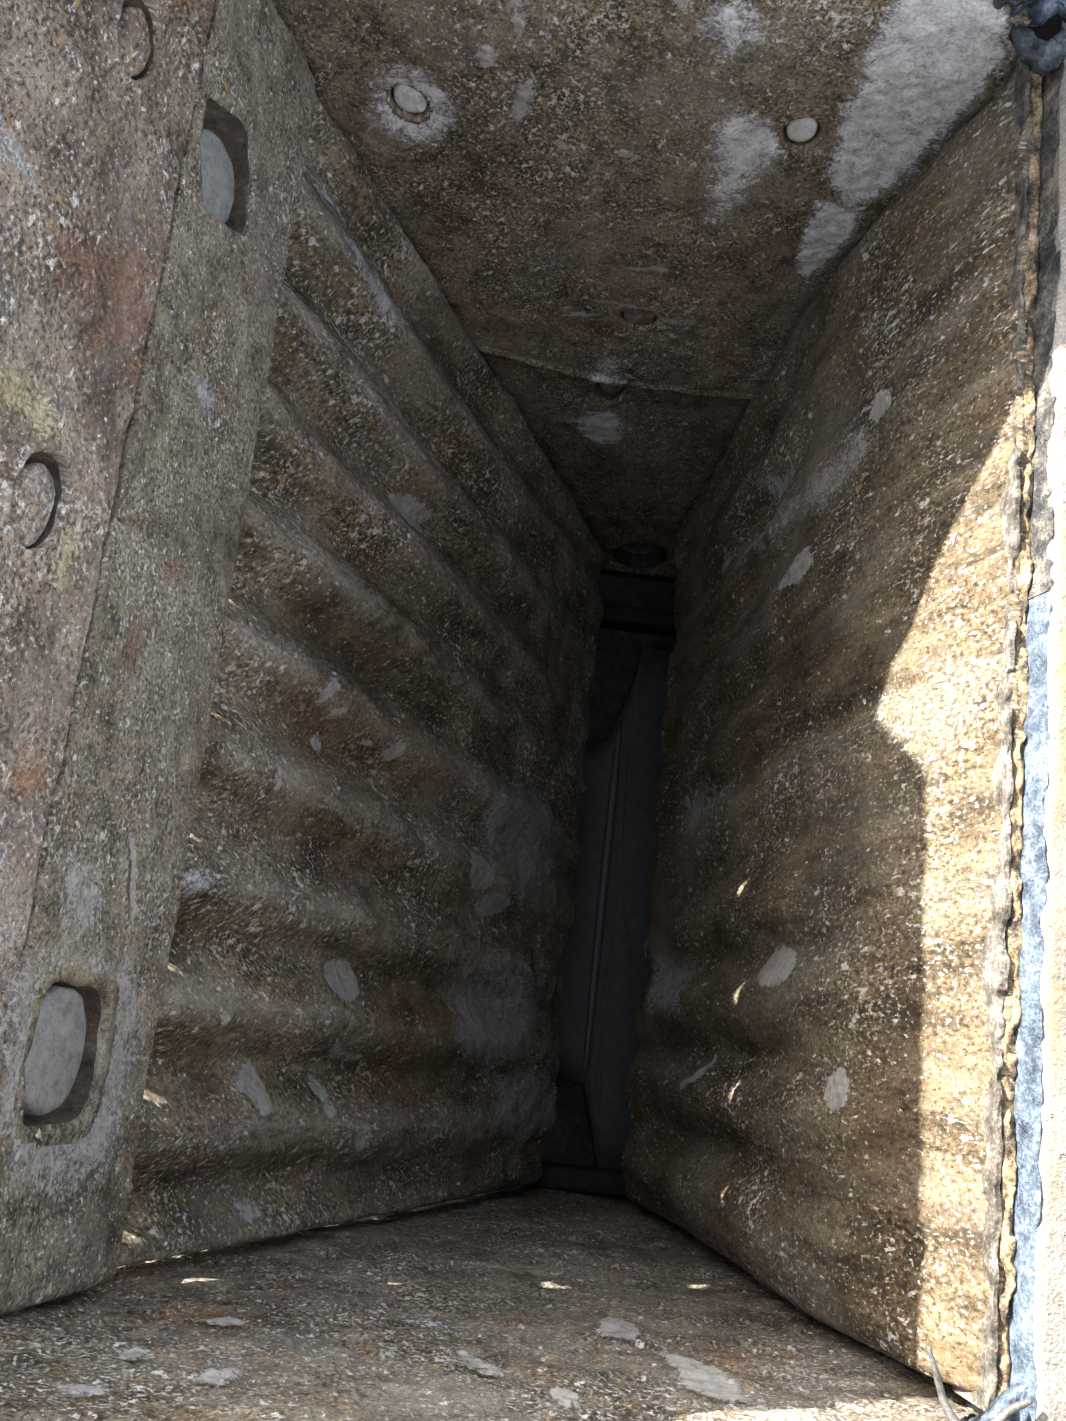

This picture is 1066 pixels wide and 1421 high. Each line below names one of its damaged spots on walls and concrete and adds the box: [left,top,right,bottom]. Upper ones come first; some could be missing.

damp [0,117,34,185]
damp [706,113,785,229]
peeling [796,0,1015,278]